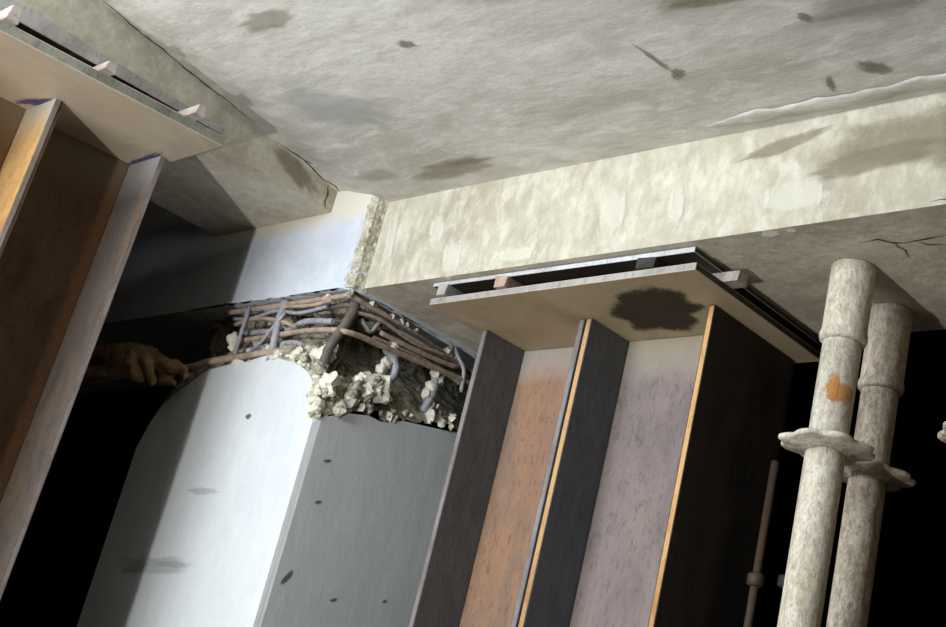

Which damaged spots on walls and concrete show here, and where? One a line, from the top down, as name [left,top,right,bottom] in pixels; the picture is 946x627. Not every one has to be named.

crack [860,236,942,258]
spalling [157,197,473,431]
corrosion [827,376,851,405]